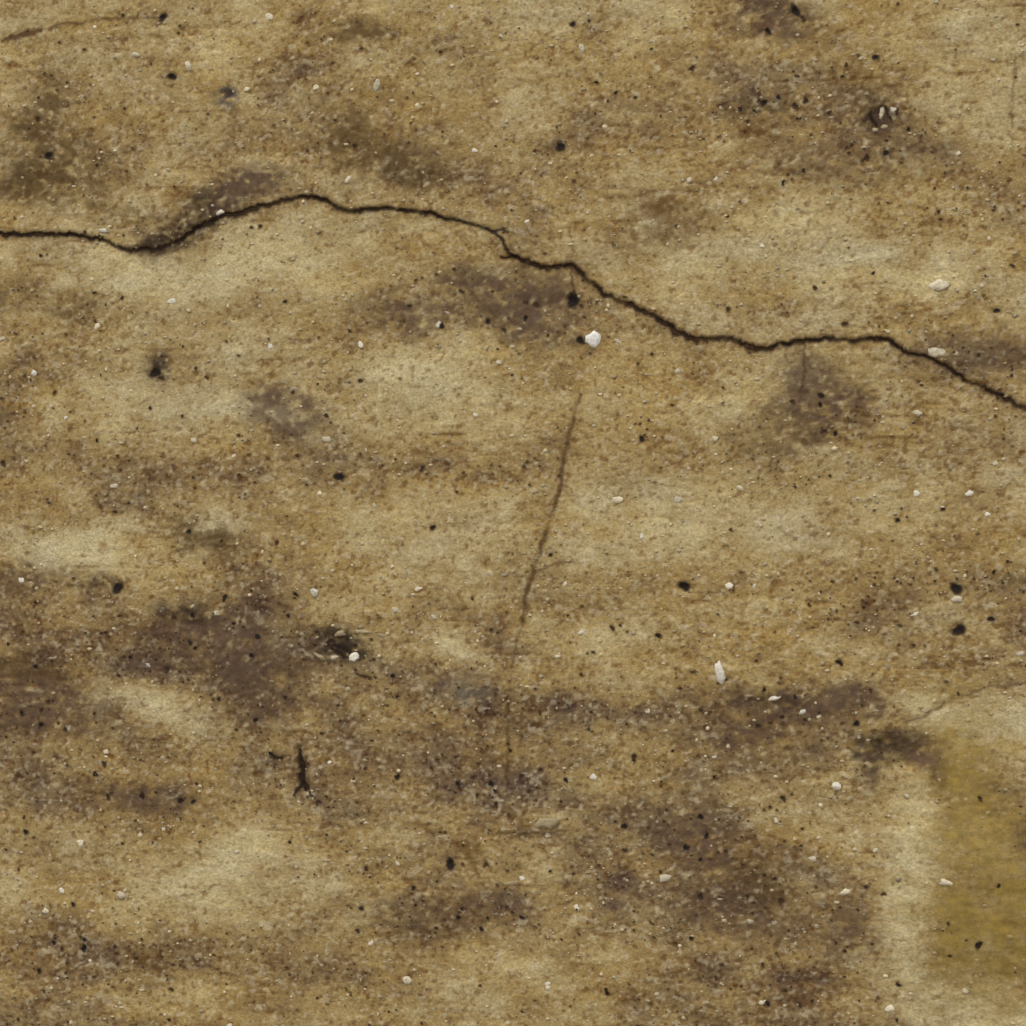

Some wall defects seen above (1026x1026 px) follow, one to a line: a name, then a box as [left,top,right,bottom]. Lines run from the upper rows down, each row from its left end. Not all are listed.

crack [0,195,1026,410]